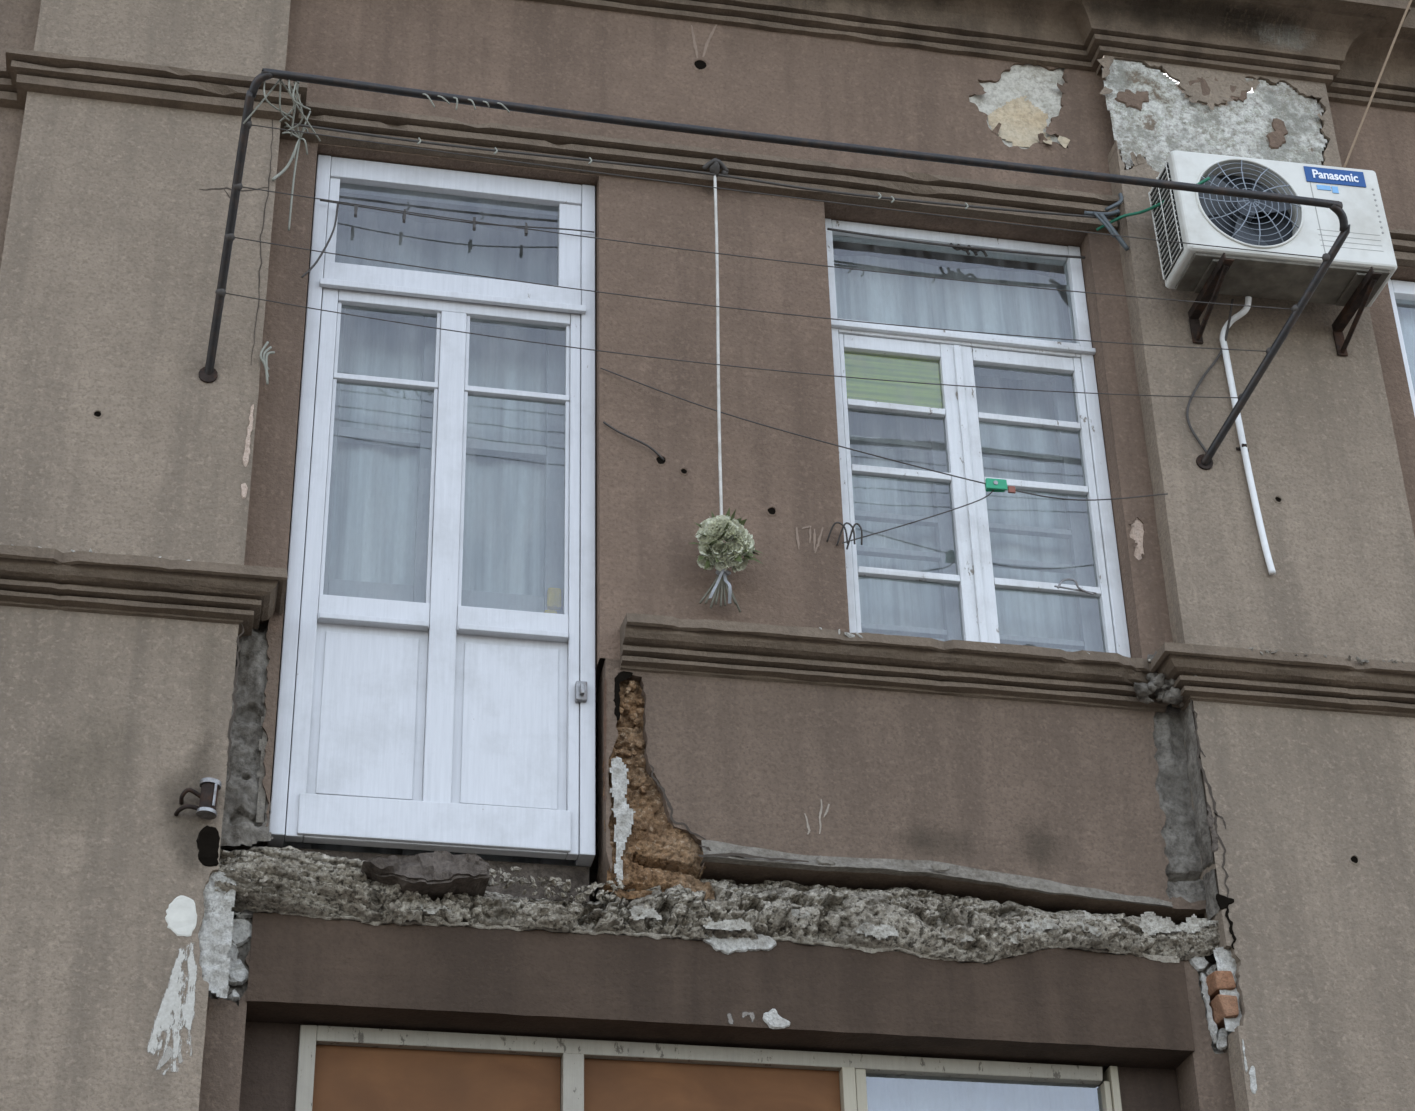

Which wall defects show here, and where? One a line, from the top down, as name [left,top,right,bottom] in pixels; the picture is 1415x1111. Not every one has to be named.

peeling [969,62,1070,149]
peeling [1098,56,1327,172]
peeling [1129,518,1146,560]
spalling [165,624,1257,1094]
crack [1190,699,1229,897]
efflorescence [147,943,197,1075]